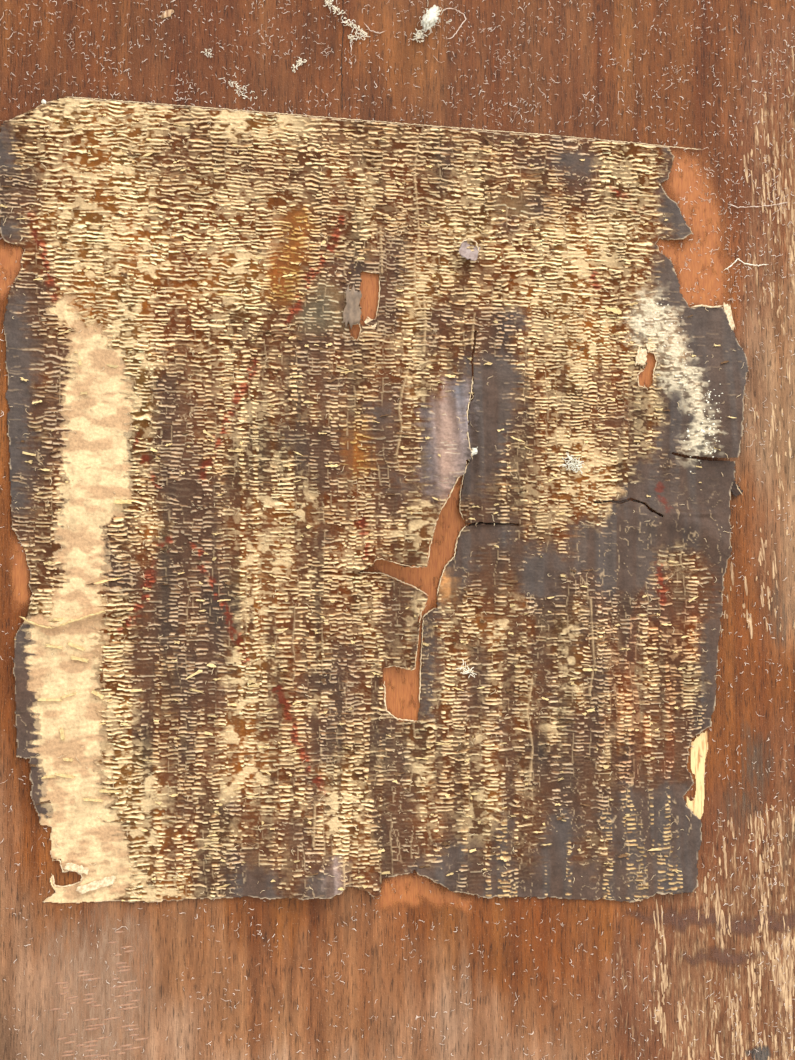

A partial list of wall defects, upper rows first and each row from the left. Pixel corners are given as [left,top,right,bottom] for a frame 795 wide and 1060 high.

peeling [459,223,500,261]
peeling [651,149,726,318]
peeling [0,245,50,298]
peeling [288,257,380,362]
peeling [562,295,660,389]
crack [468,520,517,528]
crack [594,499,650,511]
peeling [11,290,262,903]
crack [361,558,427,595]
peeling [372,480,480,723]
peeling [378,866,471,912]